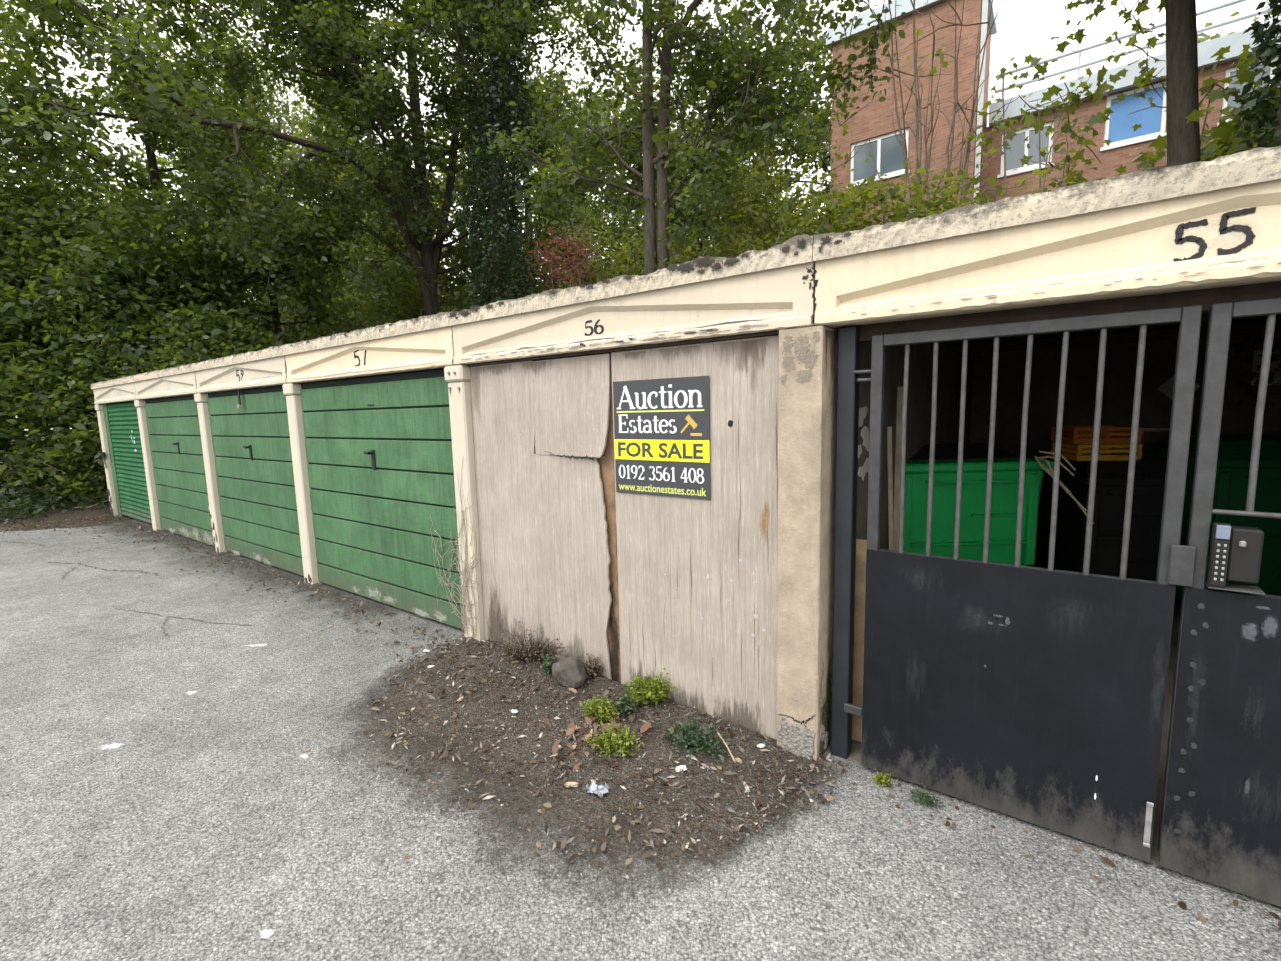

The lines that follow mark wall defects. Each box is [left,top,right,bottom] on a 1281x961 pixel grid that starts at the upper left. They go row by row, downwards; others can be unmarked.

crack [1134,257,1276,275]
crack [251,263,818,380]
crack [521,428,594,473]